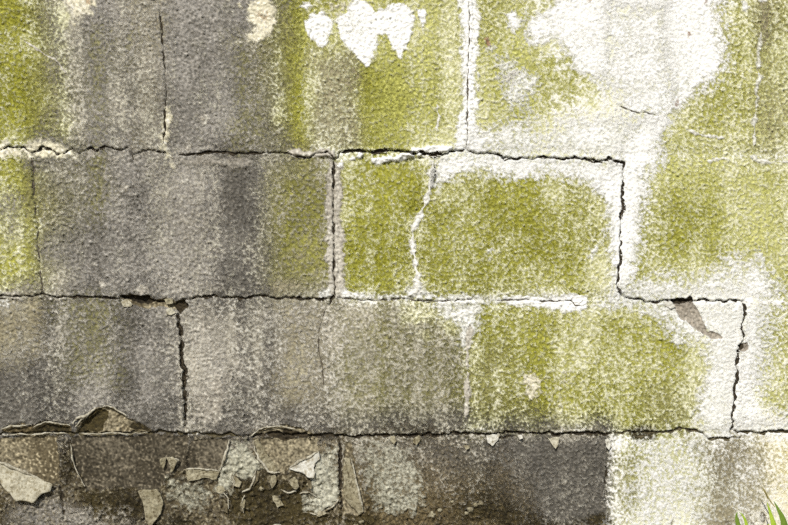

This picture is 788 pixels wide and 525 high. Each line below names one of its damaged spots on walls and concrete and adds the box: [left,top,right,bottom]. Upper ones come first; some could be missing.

crack [158,14,166,68]
leakage [535,56,579,105]
leakage [0,185,27,249]
crack [0,81,268,300]
crack [180,10,626,304]
crack [686,129,728,164]
spalling [664,296,723,339]
peeling [0,283,242,525]
crack [0,298,788,520]
peeling [249,424,366,525]